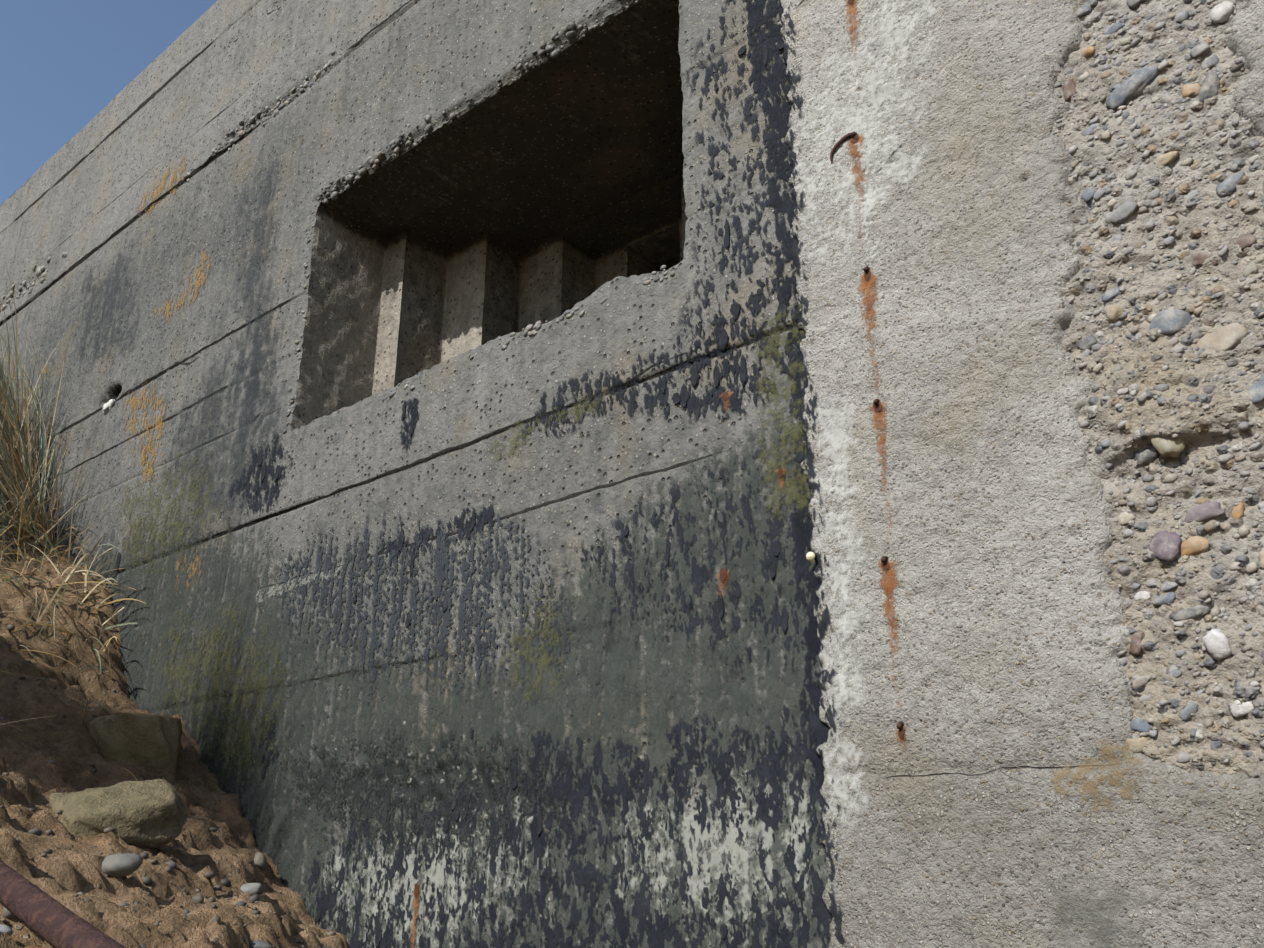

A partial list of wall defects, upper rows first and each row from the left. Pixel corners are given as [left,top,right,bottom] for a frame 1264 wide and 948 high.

rust [846,0,859,41]
rust [830,131,864,205]
rust [858,266,878,336]
spalling [1053,0,1264,778]
rust [869,399,886,491]
water stain [80,174,832,948]
rust [879,556,898,650]